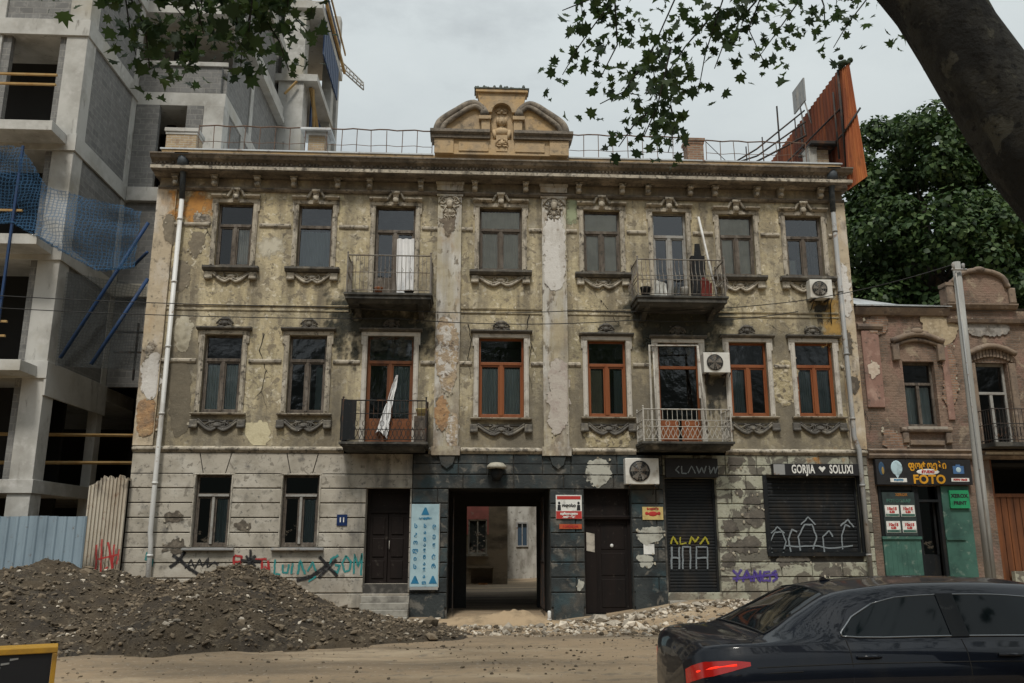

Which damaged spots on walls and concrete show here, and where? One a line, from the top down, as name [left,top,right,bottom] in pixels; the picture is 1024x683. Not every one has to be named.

peeling [136,339,169,439]
crack [259,334,272,407]
peeling [434,316,460,446]
peeling [546,355,571,437]
peeling [845,360,880,394]
spalling [583,426,635,488]
spalling [163,510,184,528]
peeling [636,526,666,568]
peeling [720,488,765,570]
peeling [776,556,843,579]